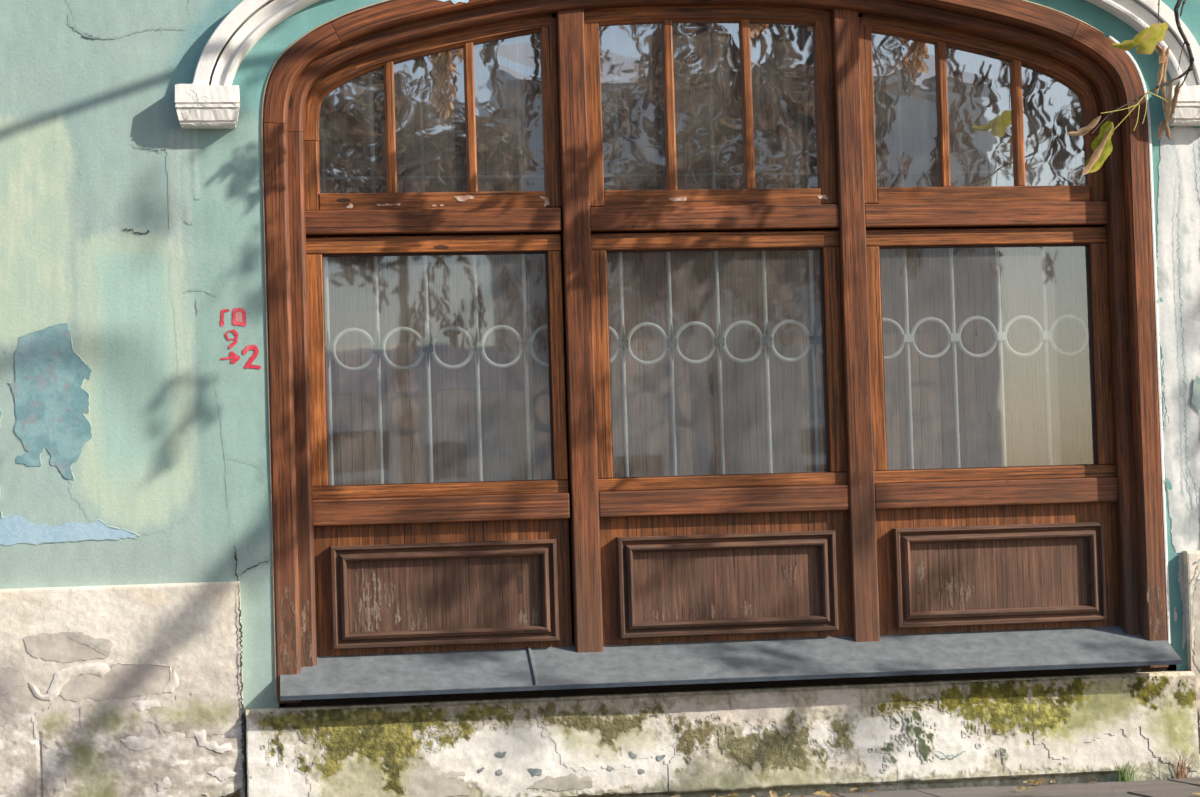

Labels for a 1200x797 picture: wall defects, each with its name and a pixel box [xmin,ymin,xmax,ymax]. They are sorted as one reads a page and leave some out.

peeling [0,322,92,481]
spalling [1156,122,1200,670]
peeling [0,486,140,546]
spalling [0,632,180,711]
crack [201,546,269,797]
peeling [121,735,157,751]
damp [542,707,835,797]